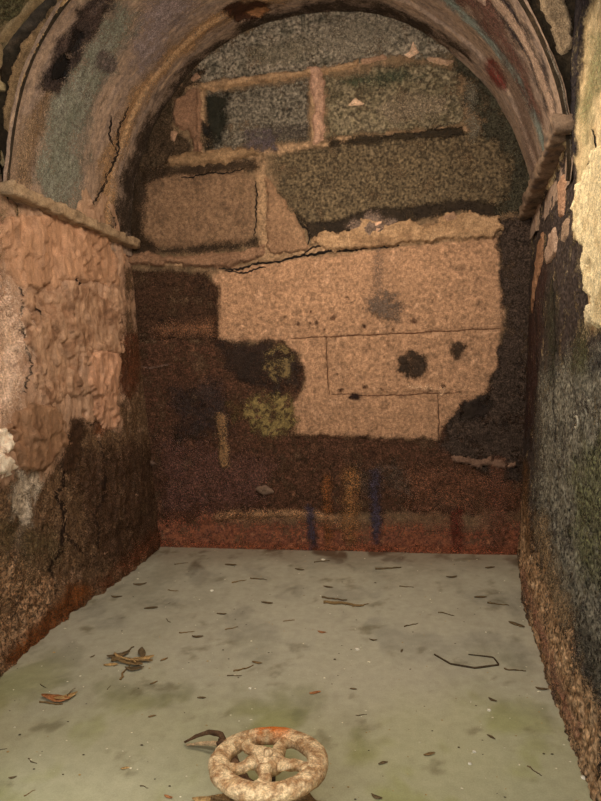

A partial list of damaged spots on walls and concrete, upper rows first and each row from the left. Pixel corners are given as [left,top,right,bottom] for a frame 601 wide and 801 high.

peeling [540,0,573,55]
crack [218,216,399,274]
peeling [0,177,504,479]
water stain [438,0,601,712]
water stain [0,264,524,676]
peeling [451,455,516,470]
water stain [564,721,601,780]